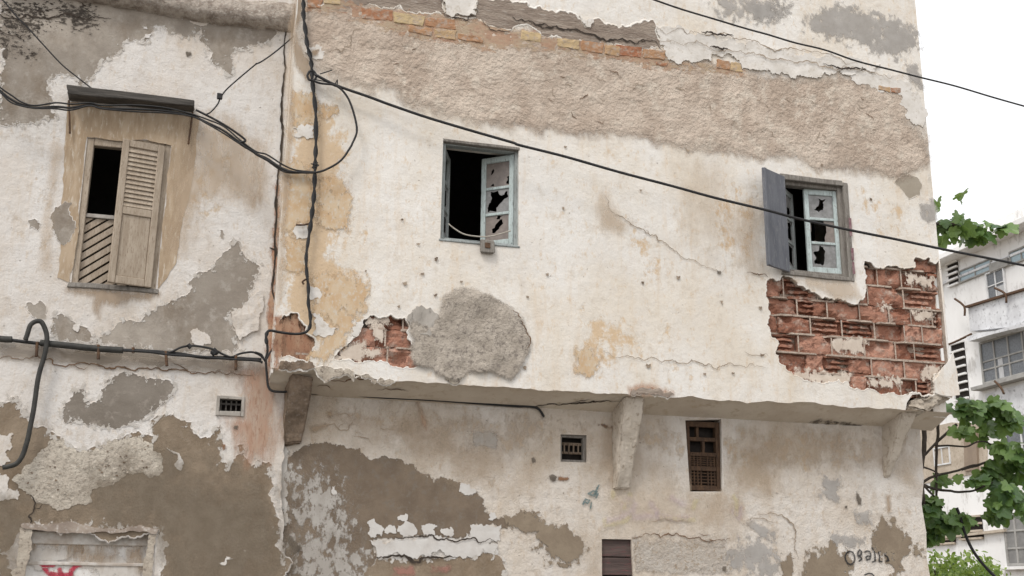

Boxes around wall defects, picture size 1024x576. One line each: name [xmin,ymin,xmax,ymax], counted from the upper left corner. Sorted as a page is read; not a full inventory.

flaking render [0,0,930,200]
peeling [27,201,76,246]
peeling [0,229,301,576]
peeling [269,157,420,386]
crack [606,197,717,270]
flaking render [759,256,960,417]
peeling [364,534,508,576]
peeling [503,510,589,568]